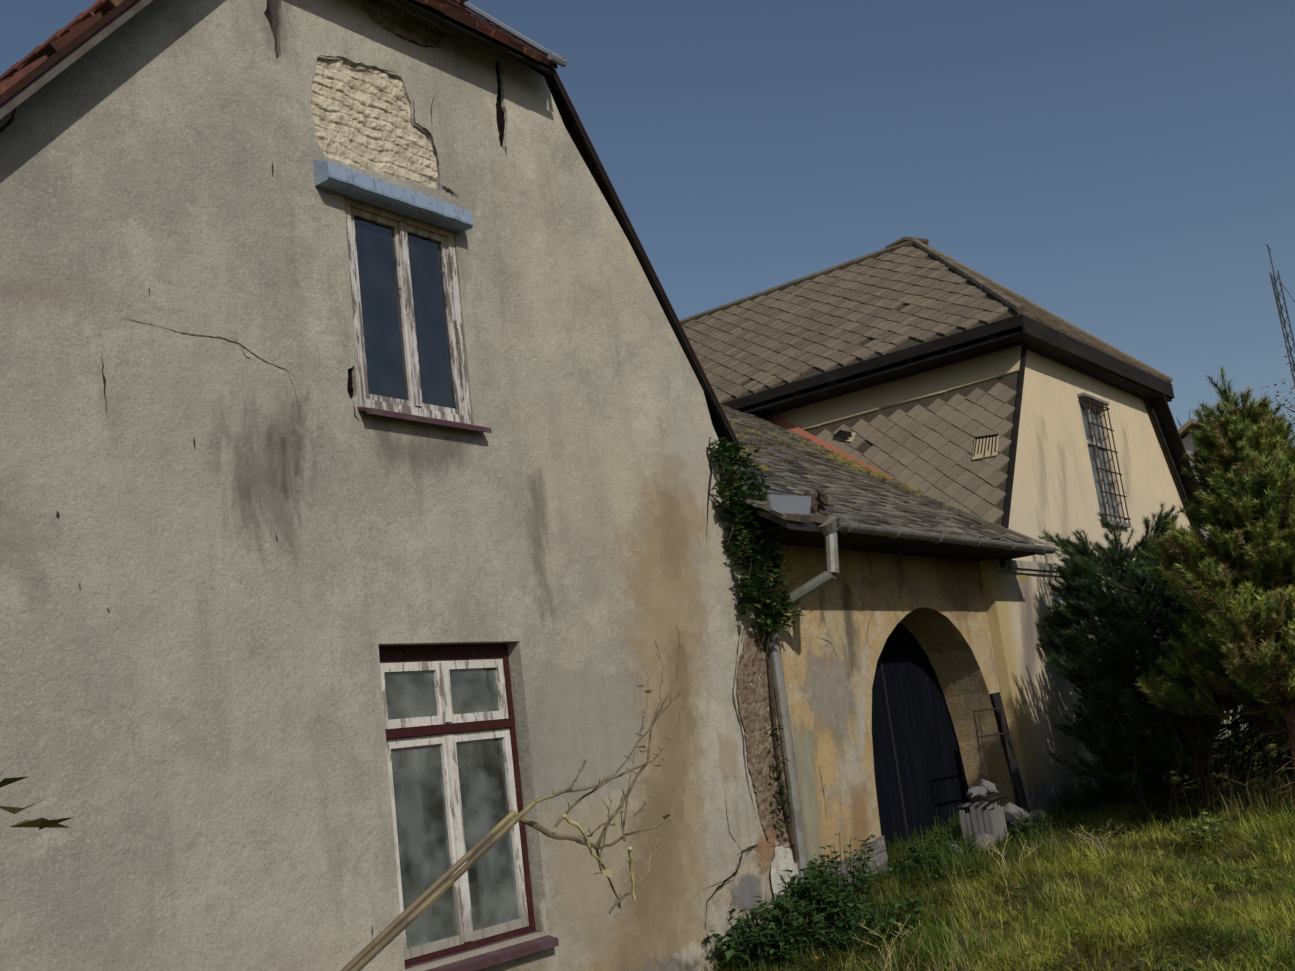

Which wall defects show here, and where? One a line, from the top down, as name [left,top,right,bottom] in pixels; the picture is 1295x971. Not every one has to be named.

crack [264,0,279,59]
crack [0,108,16,133]
peeling [311,55,459,196]
crack [495,62,507,155]
crack [100,361,108,413]
crack [123,318,299,410]
spalling [347,368,360,421]
damp [596,492,703,971]
damp [839,586,866,803]
flaking render [704,632,799,965]